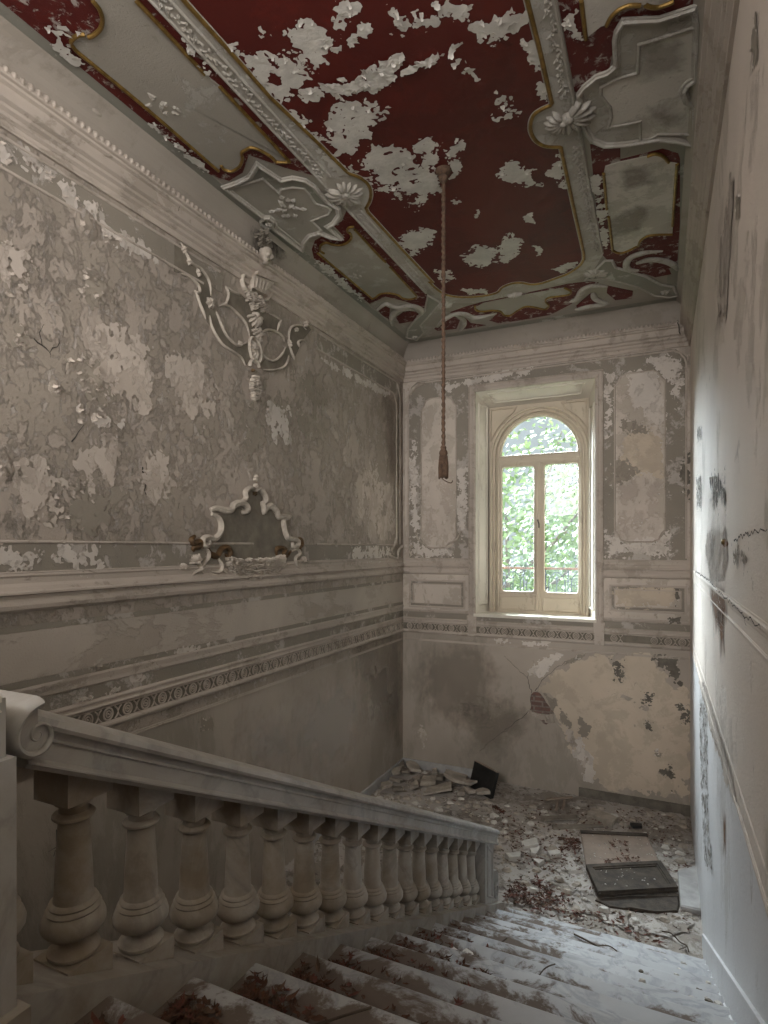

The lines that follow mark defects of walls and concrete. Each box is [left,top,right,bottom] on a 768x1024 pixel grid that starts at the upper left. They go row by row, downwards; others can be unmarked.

peeling [561,9,584,41]
peeling [224,0,547,211]
peeling [0,239,39,305]
peeling [0,141,159,266]
peeling [398,227,437,256]
peeling [460,232,543,268]
peeling [495,154,568,189]
peeling [12,322,219,528]
peeling [604,353,685,439]
peeling [409,440,468,560]
peeling [0,539,105,578]
peeling [494,638,737,874]